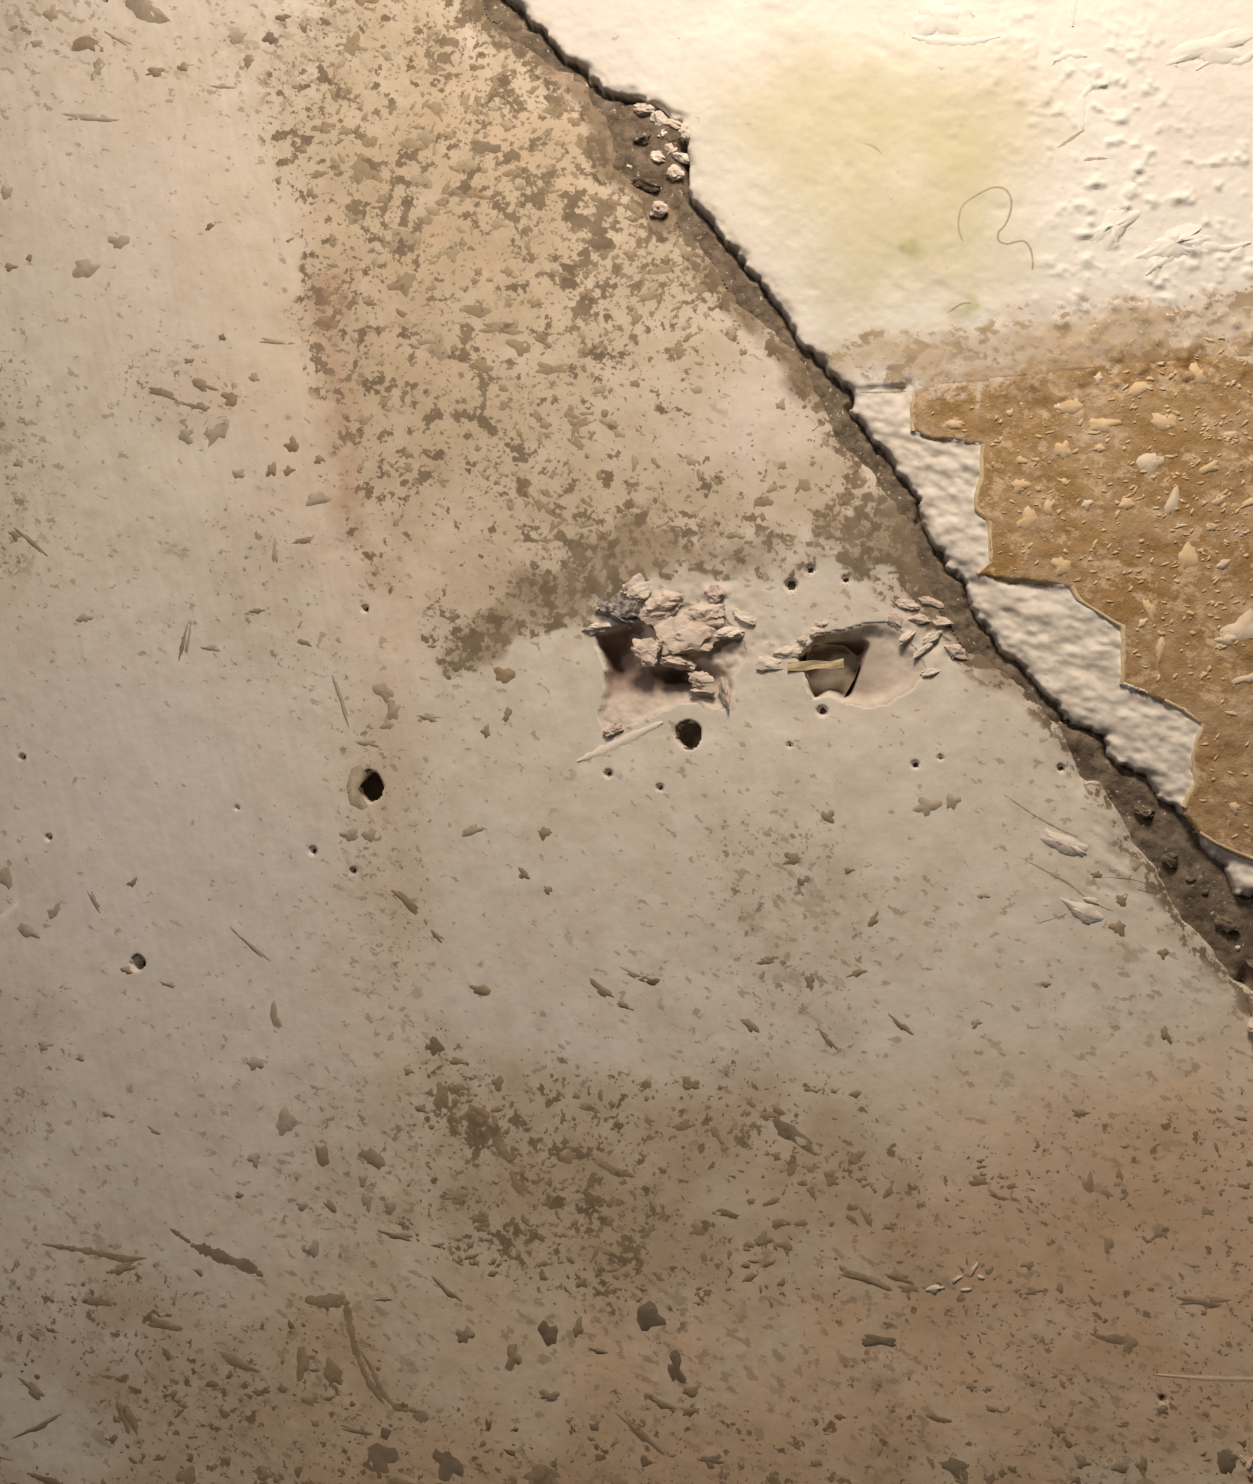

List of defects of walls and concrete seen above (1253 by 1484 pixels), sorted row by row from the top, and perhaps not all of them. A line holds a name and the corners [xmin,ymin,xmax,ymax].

water stain [125,345,260,448]
water stain [211,0,936,695]
water stain [178,618,251,667]
water stain [324,668,442,769]
spalling [582,573,968,737]
peeling [910,332,1253,861]